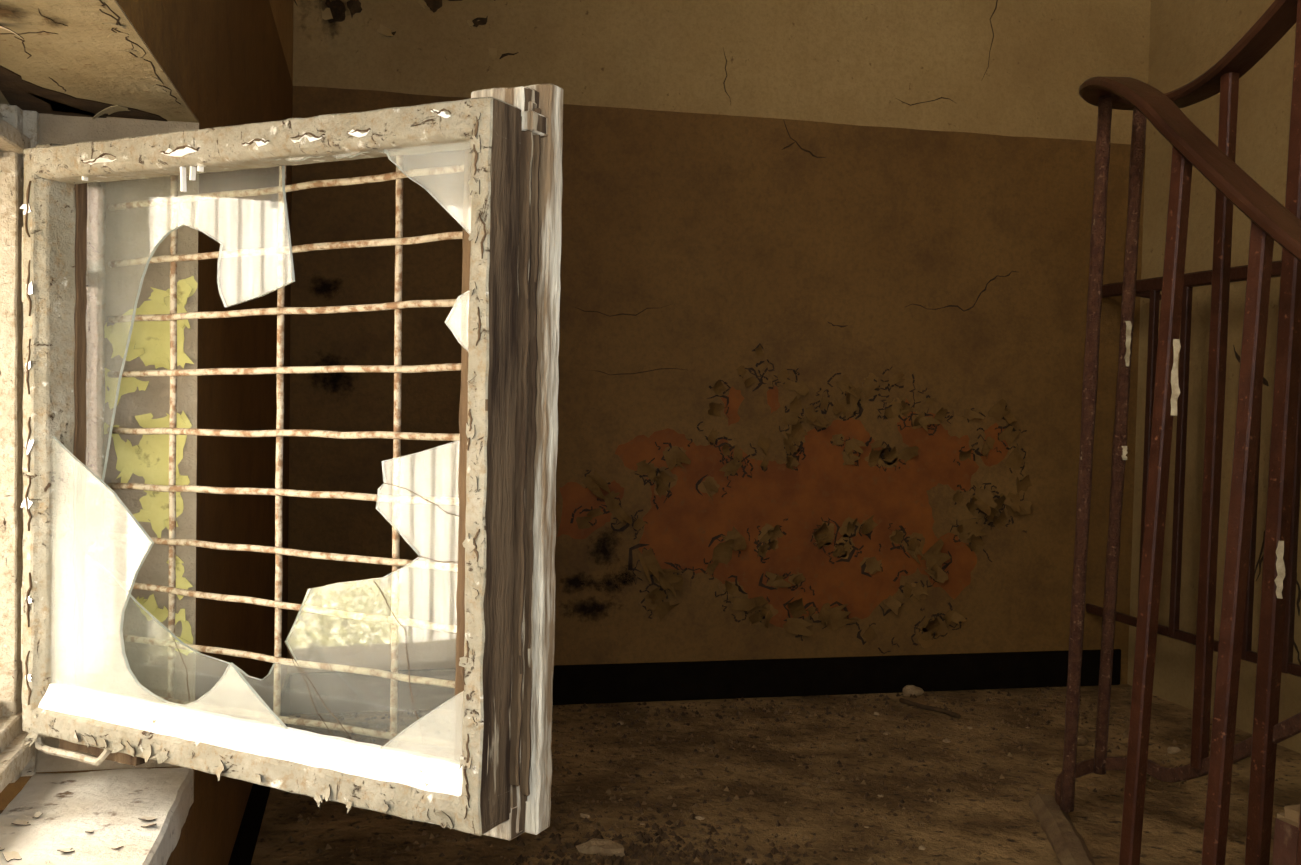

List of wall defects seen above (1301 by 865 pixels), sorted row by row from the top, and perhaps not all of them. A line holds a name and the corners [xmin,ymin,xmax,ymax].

crack [0,9,68,92]
crack [99,0,180,104]
peeling [321,0,362,23]
peeling [418,0,462,12]
crack [982,0,998,79]